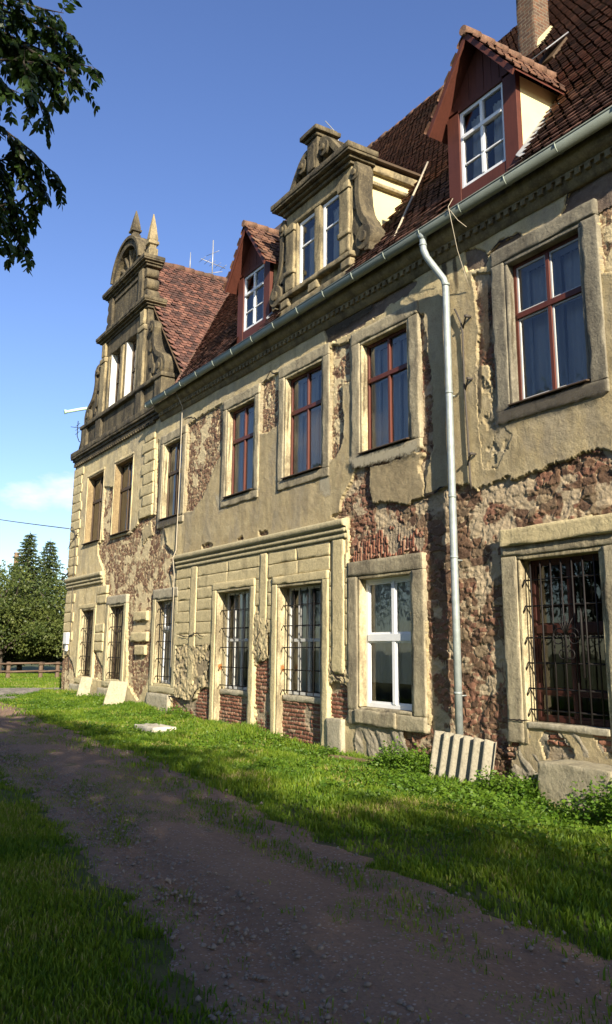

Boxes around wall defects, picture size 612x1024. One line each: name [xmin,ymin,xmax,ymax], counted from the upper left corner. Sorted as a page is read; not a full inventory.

spalling [563,170,612,272]
spalling [262,374,279,433]
spalling [186,405,222,511]
spalling [327,234,612,782]
spalling [99,444,175,699]